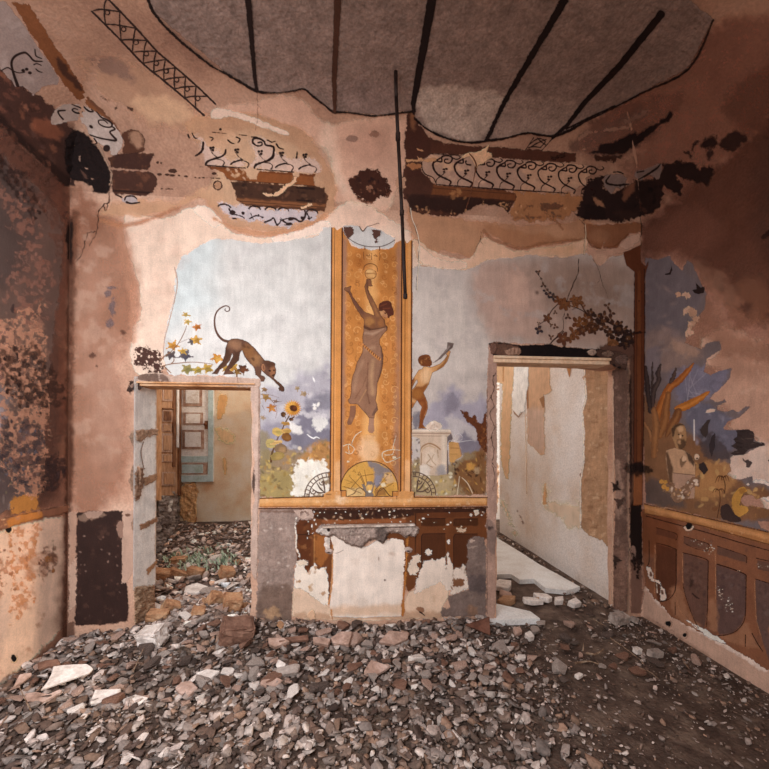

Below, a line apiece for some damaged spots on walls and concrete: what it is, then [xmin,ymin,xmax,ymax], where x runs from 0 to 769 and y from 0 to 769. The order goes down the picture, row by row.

flaking render [64,130,113,193]
damp [407,17,769,319]
flaking render [0,297,53,497]
damp [0,58,337,637]
flaking render [116,0,714,624]
flaking render [701,326,769,486]
flaking render [0,511,103,684]